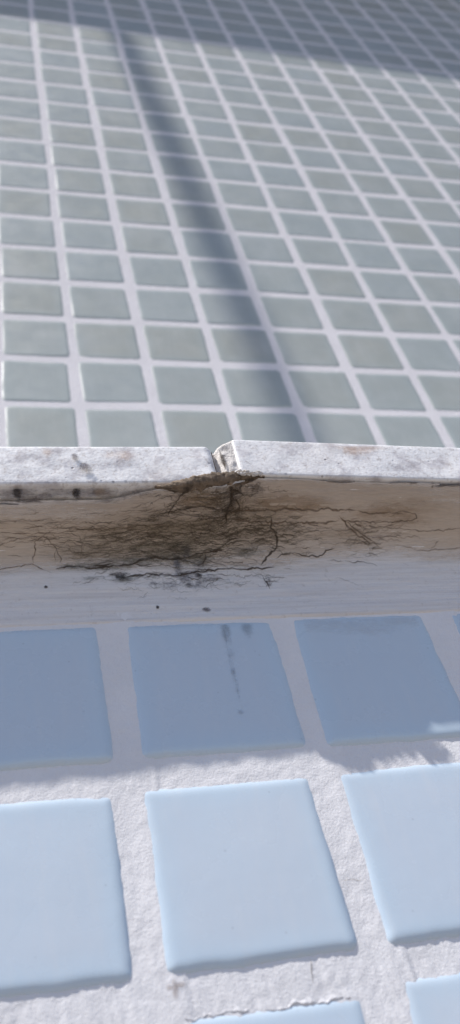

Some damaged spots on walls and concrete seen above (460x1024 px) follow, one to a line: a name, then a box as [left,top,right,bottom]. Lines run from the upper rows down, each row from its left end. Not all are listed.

crack [0,450,458,589]
water stain [0,480,460,570]
spalling [234,469,264,481]